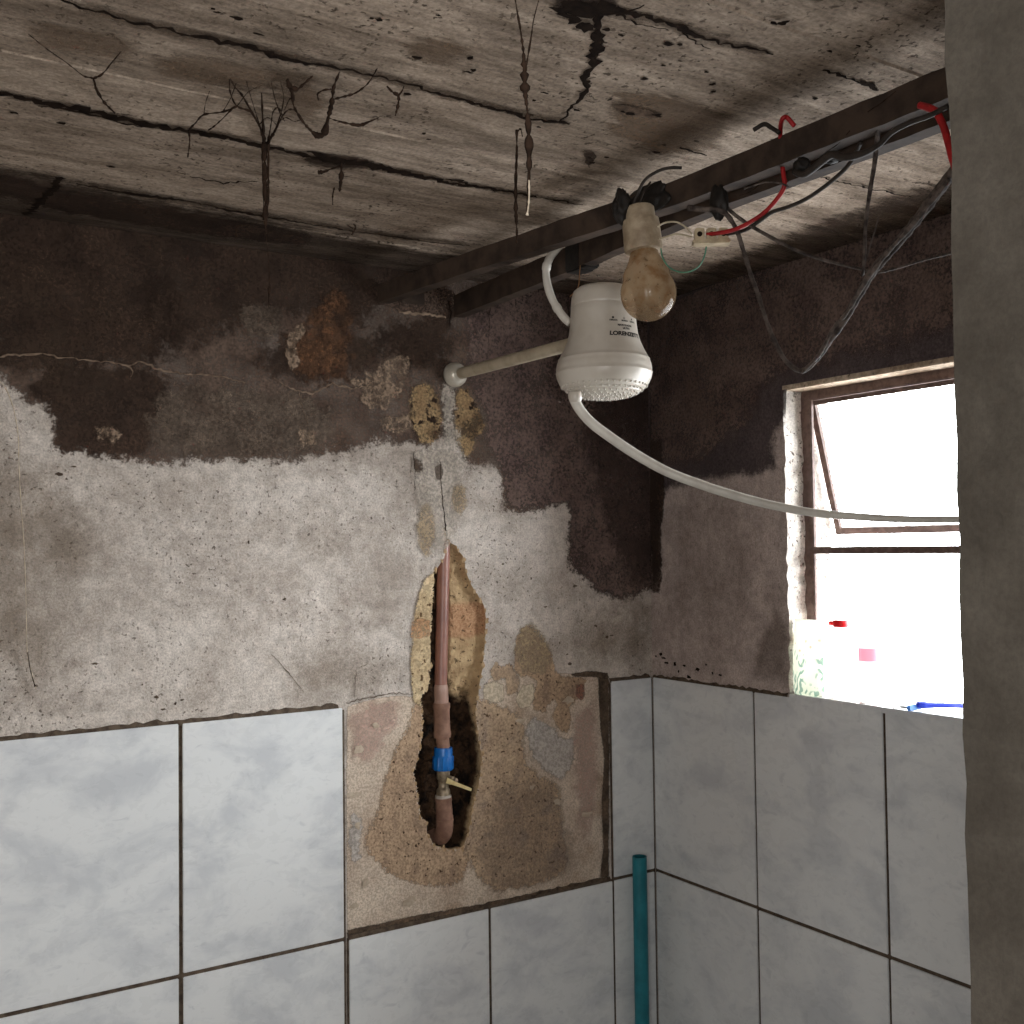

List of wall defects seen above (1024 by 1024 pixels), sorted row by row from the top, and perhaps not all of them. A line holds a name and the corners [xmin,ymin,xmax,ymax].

crack [61,0,773,125]
crack [0,91,582,205]
water stain [609,93,733,155]
crack [22,176,470,246]
crack [0,353,246,383]
rust [285,289,356,387]
flaking render [349,355,485,460]
water stain [582,387,666,593]
peeling [346,528,610,936]